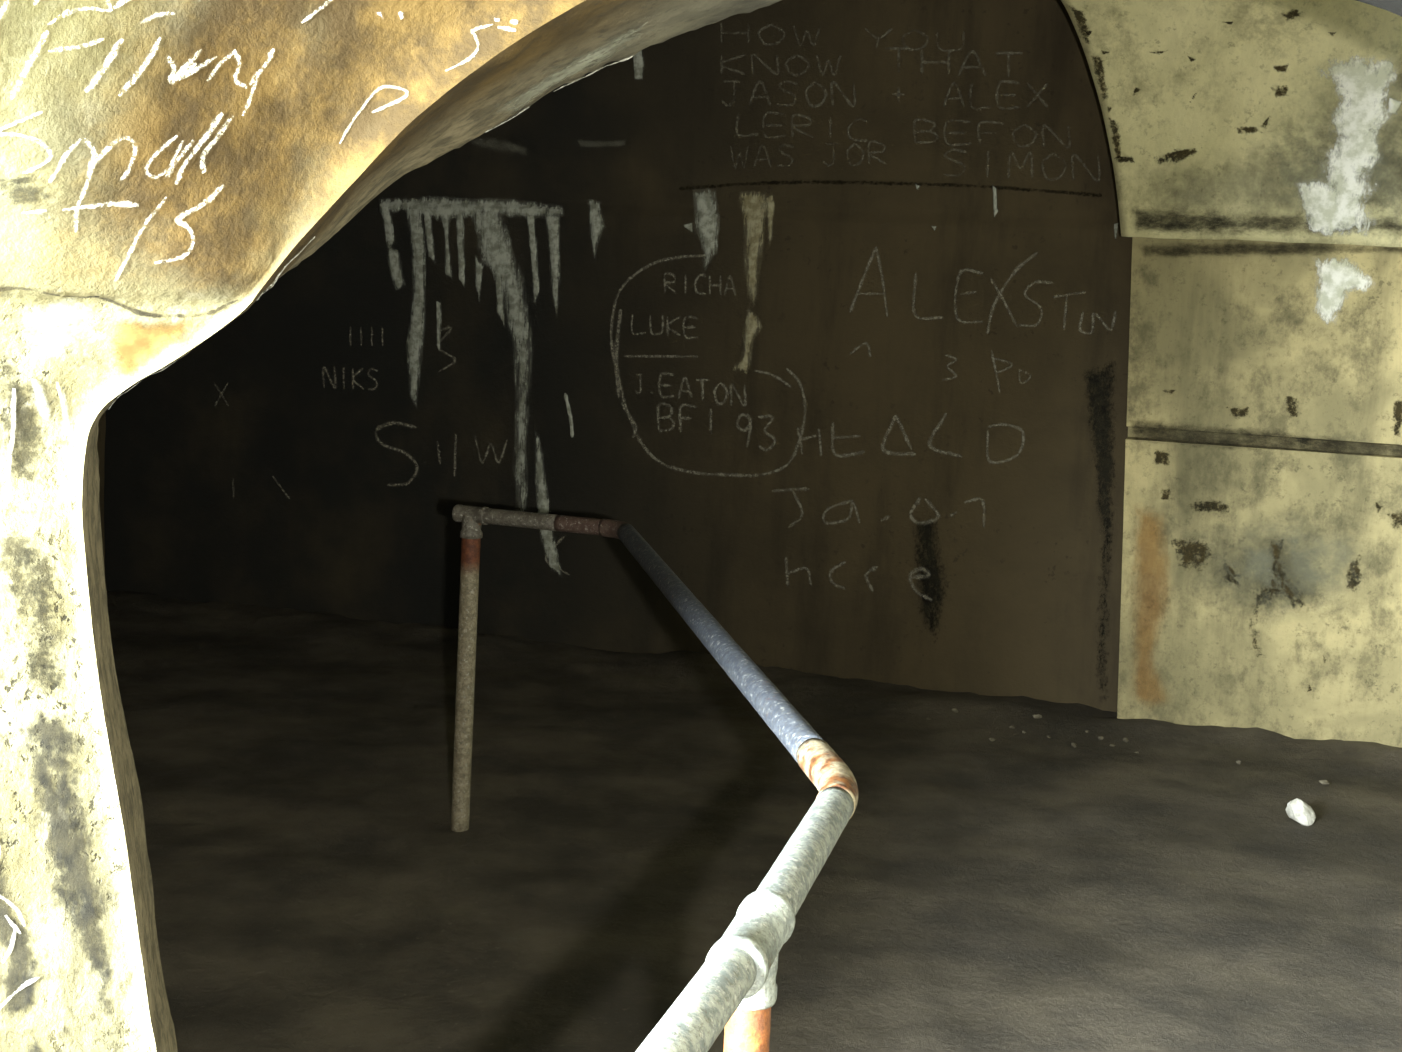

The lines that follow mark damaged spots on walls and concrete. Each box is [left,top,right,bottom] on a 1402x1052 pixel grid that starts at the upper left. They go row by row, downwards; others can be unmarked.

leakage [1245,57,1402,235]
leakage [590,201,604,255]
leakage [683,191,718,266]
leakage [733,193,774,371]
leakage [1316,258,1372,323]
leakage [6,388,17,482]
leakage [380,198,563,575]
leakage [1191,501,1229,512]
leakage [1172,539,1306,655]
leakage [1344,555,1362,590]
leakage [21,713,111,1013]
leakage [0,865,37,1014]